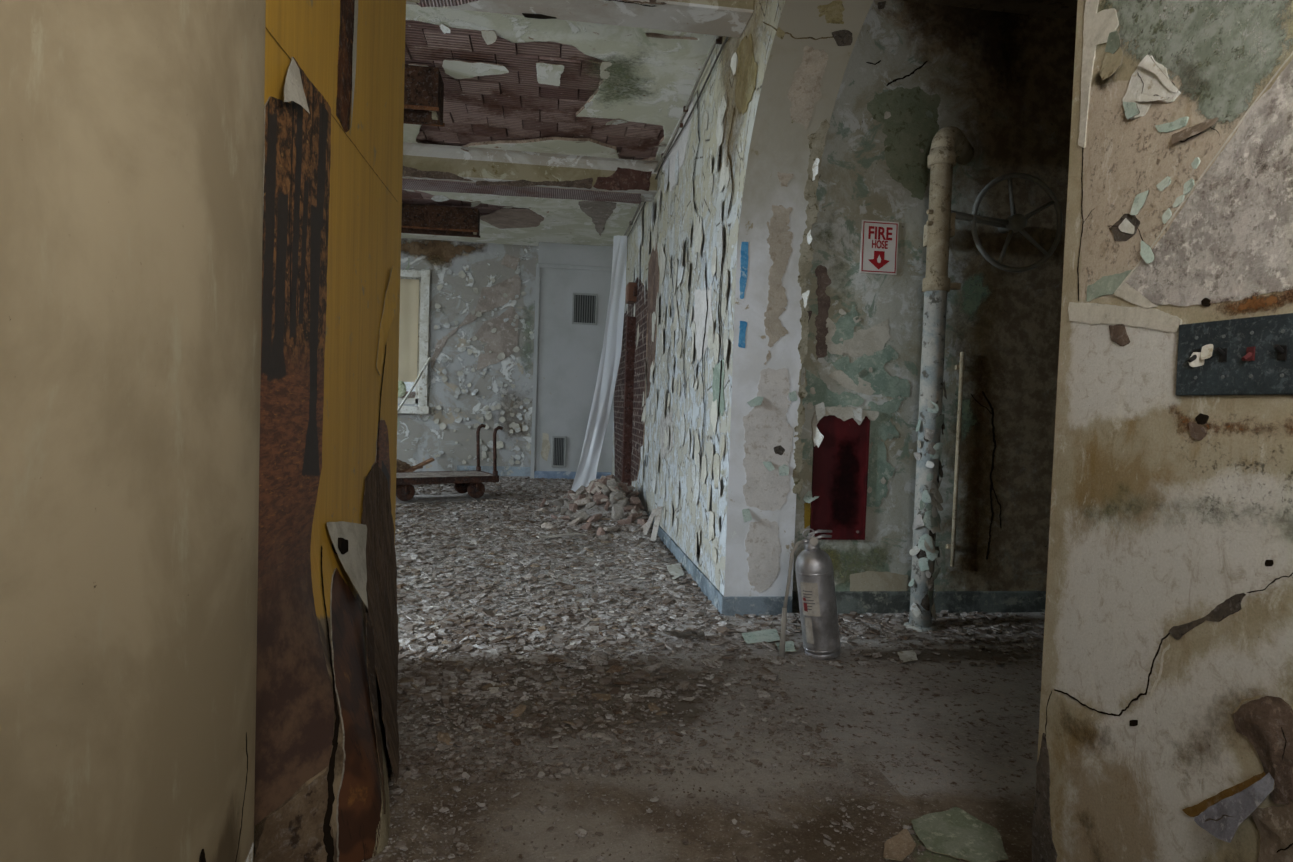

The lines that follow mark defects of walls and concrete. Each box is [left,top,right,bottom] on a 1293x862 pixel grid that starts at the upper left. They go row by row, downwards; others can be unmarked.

peeling [481,30,497,45]
peeling [867,86,941,200]
flaking render [1095,30,1293,309]
flaking render [402,33,758,563]
peeling [742,119,911,593]
peeling [909,379,947,591]
peeling [666,564,684,580]
peeling [910,603,938,618]
crack [1054,572,1293,743]
flaking render [1183,696,1293,843]